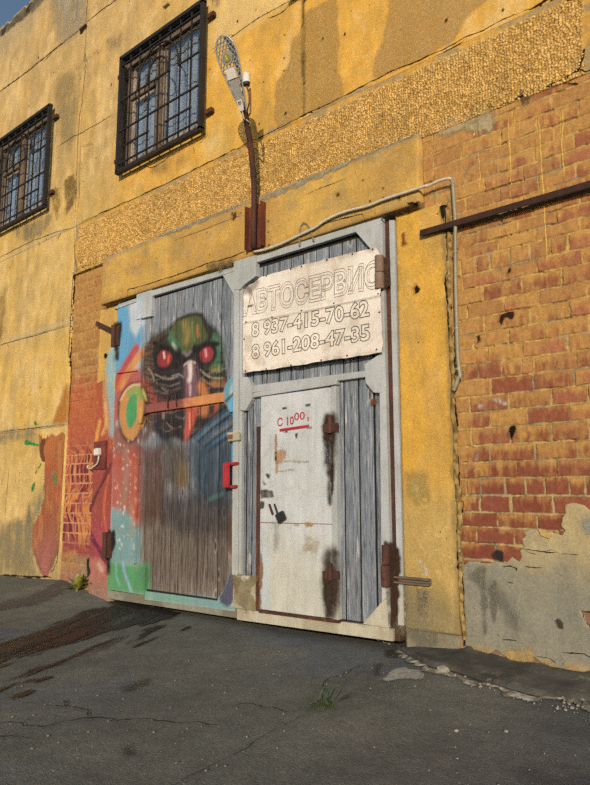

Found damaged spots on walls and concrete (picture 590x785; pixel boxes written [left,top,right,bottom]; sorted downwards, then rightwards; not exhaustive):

crack [488,49,589,108]
crack [1,0,567,432]
corrosion [323,413,336,500]
flaking render [440,205,590,672]
corrosion [322,549,339,618]
water stain [0,605,181,699]
spalling [377,639,590,712]